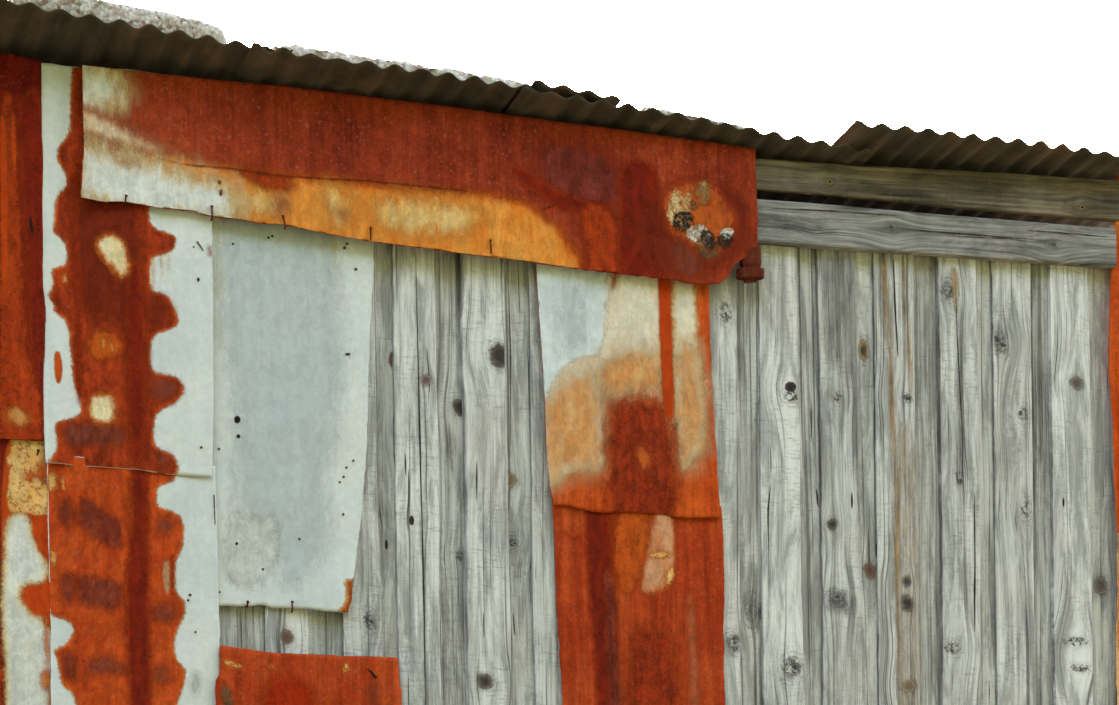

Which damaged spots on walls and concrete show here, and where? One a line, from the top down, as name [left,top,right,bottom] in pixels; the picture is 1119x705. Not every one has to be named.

rust [144,152,584,269]
rust [0,67,186,705]
rust [585,160,750,705]
rust [339,579,353,613]
rust [221,680,234,705]